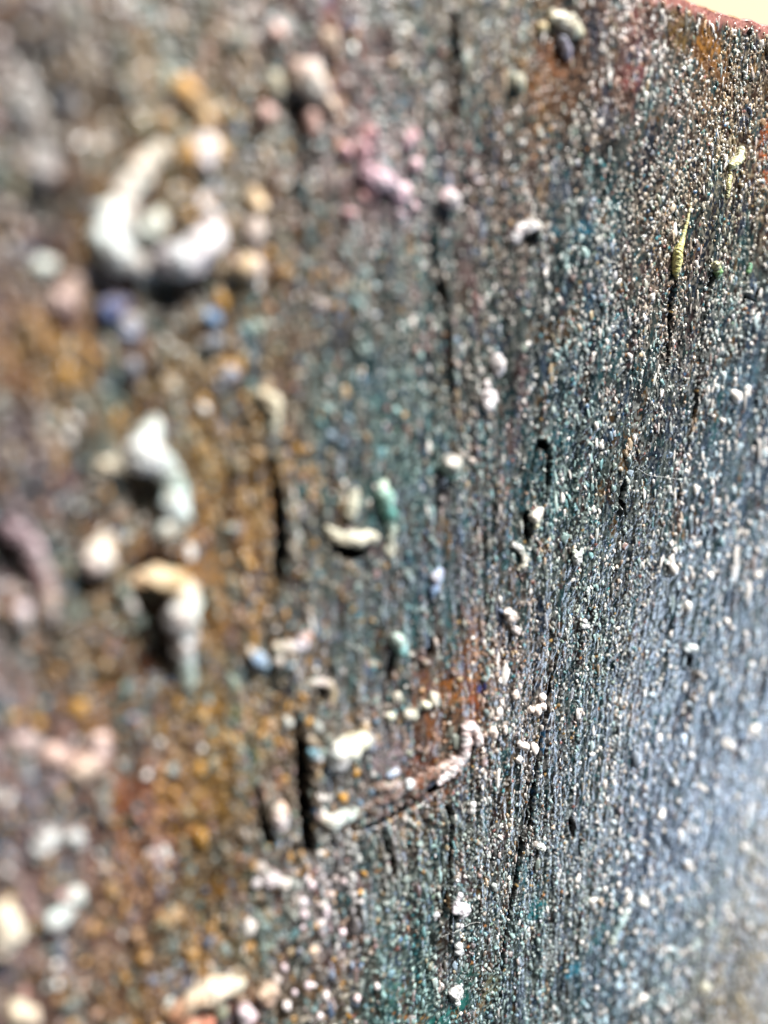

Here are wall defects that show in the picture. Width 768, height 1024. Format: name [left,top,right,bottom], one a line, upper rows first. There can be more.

crack [531,440,550,496]
crack [521,513,529,537]
crack [500,663,555,969]